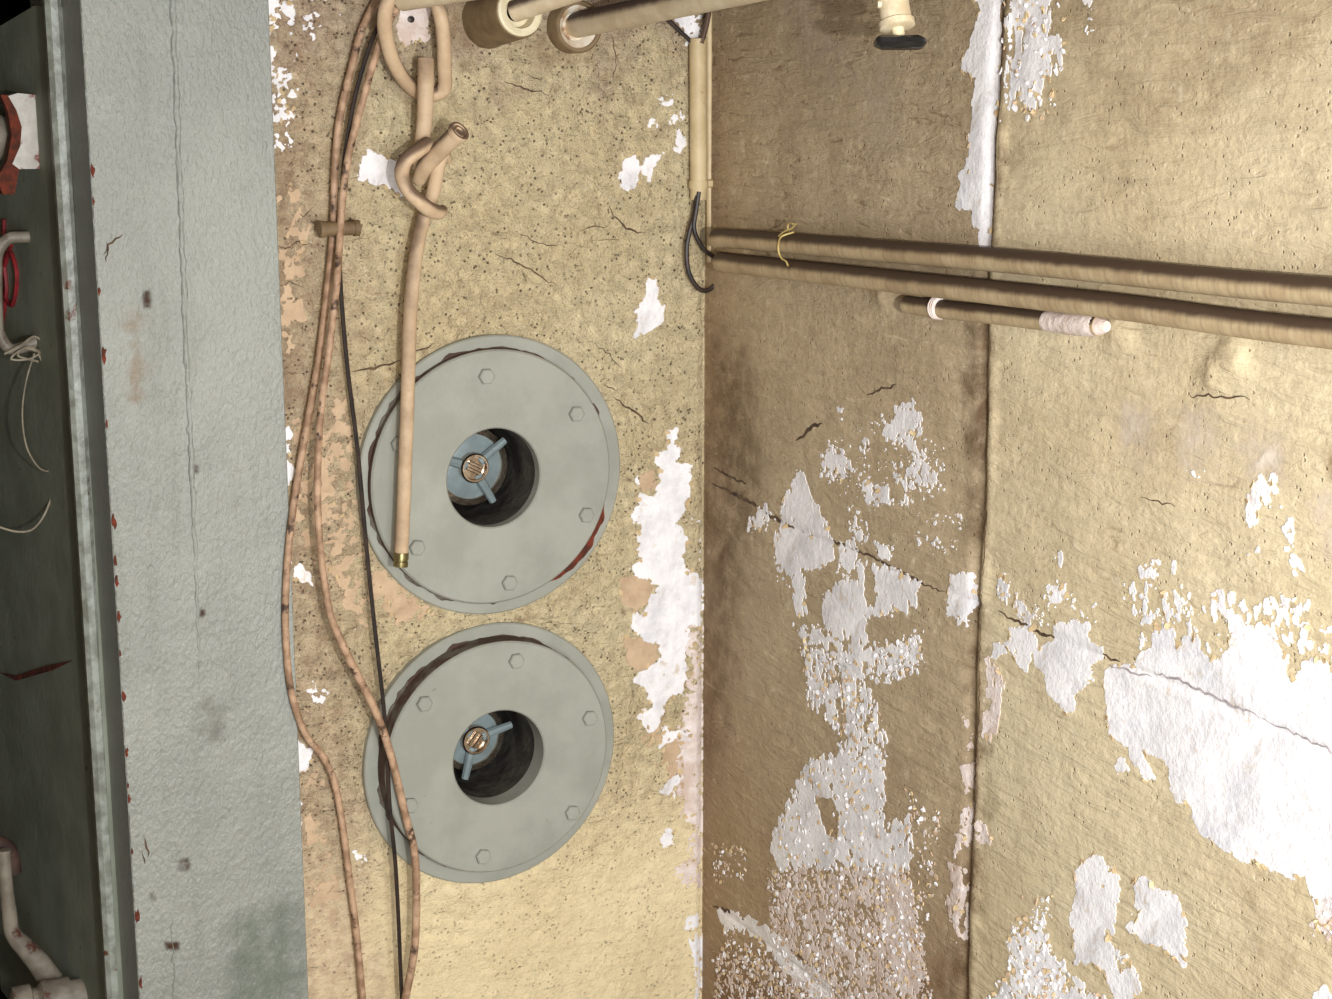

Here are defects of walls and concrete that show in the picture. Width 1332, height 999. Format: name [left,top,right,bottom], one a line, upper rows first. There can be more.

peeling [268,0,326,152]
peeling [396,7,431,48]
peeling [674,15,702,46]
crack [992,0,1004,233]
peeling [955,0,1066,248]
crack [712,467,945,592]
crack [981,355,989,576]
crack [1190,392,1250,400]
peeling [619,427,747,891]
peeling [684,398,1332,999]
crack [968,611,1055,999]
crack [1103,654,1332,754]